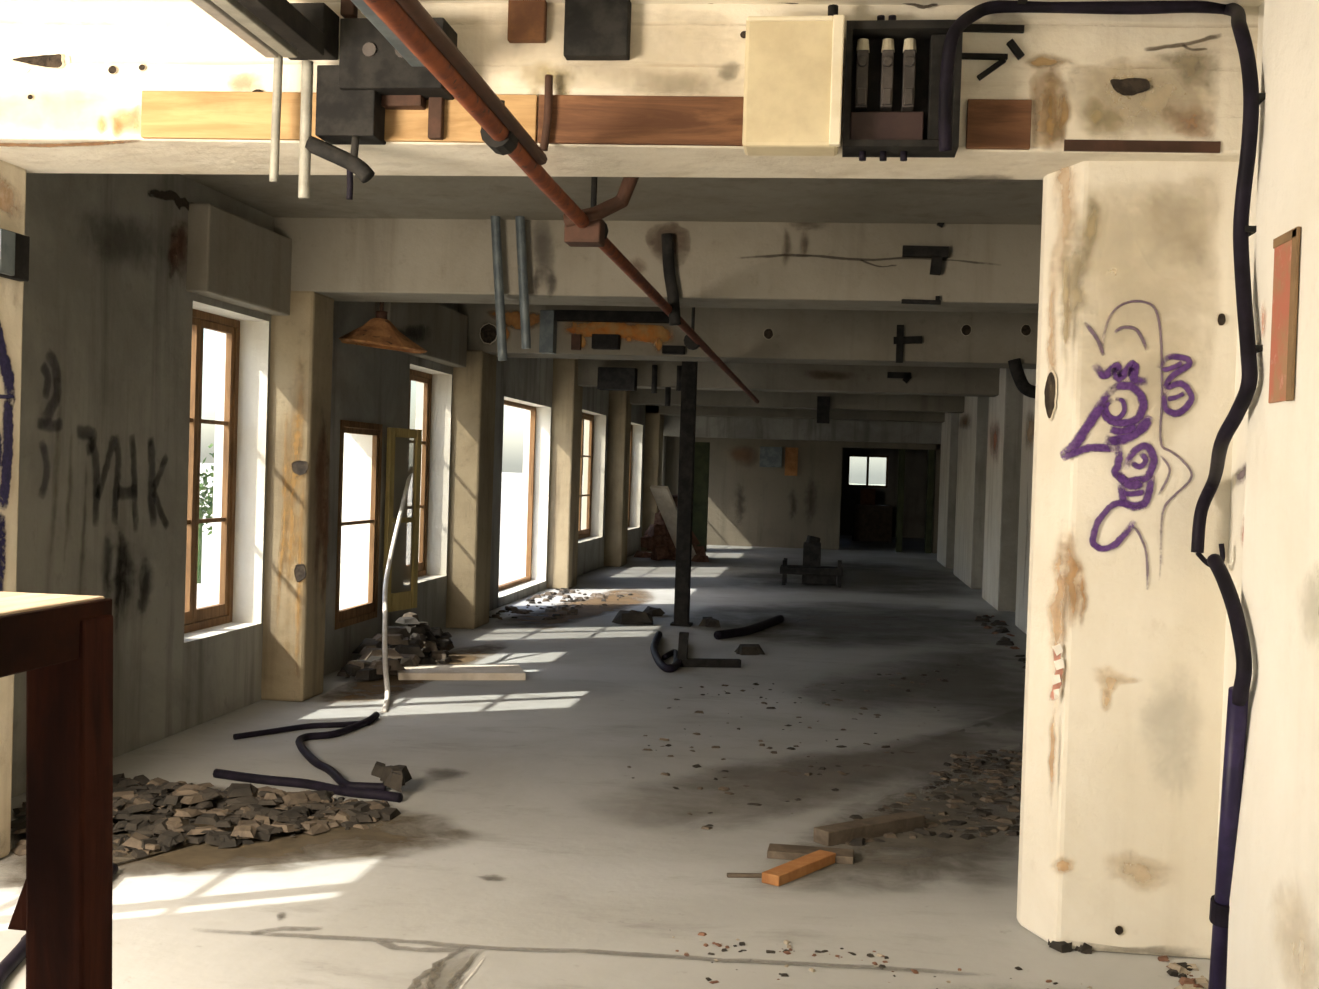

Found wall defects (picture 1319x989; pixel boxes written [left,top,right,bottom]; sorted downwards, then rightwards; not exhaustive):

water stain [1091,54,1201,133]
peeling [1050,644,1064,700]
crack [239,927,920,989]